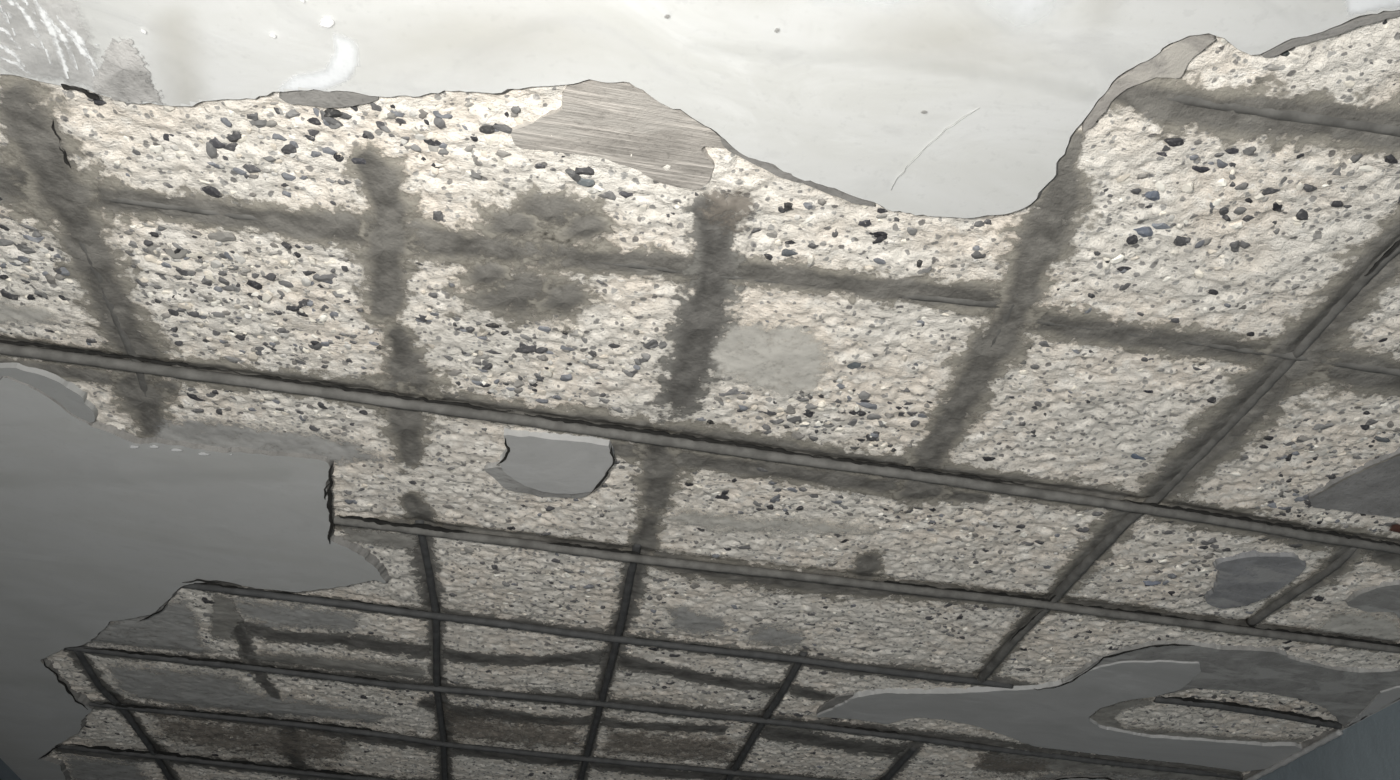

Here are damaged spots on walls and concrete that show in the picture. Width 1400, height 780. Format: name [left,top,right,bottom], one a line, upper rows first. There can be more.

spalling [0,0,1400,342]
crack [891,107,980,190]
spalling [0,197,1400,780]
water stain [54,437,1400,780]